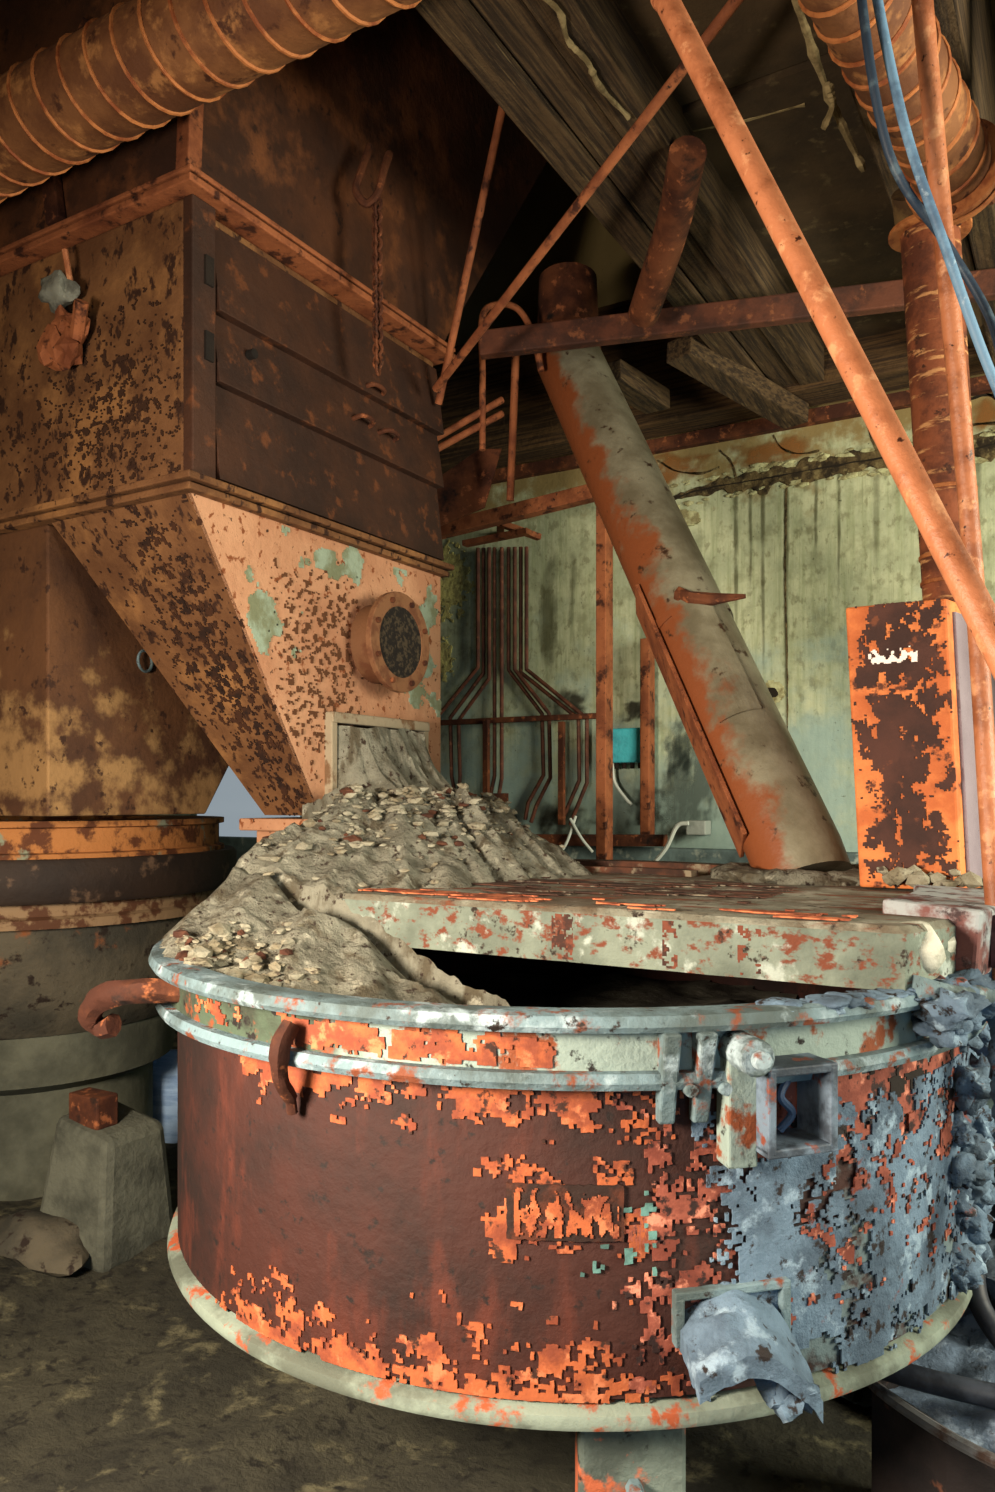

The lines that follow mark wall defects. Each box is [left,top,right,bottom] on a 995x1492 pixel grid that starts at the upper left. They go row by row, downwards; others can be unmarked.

rust [975,400,995,427]
rust [747,437,805,465]
rust [659,453,709,483]
water stain [734,488,765,621]
water stain [636,724,713,840]
water stain [540,806,581,834]